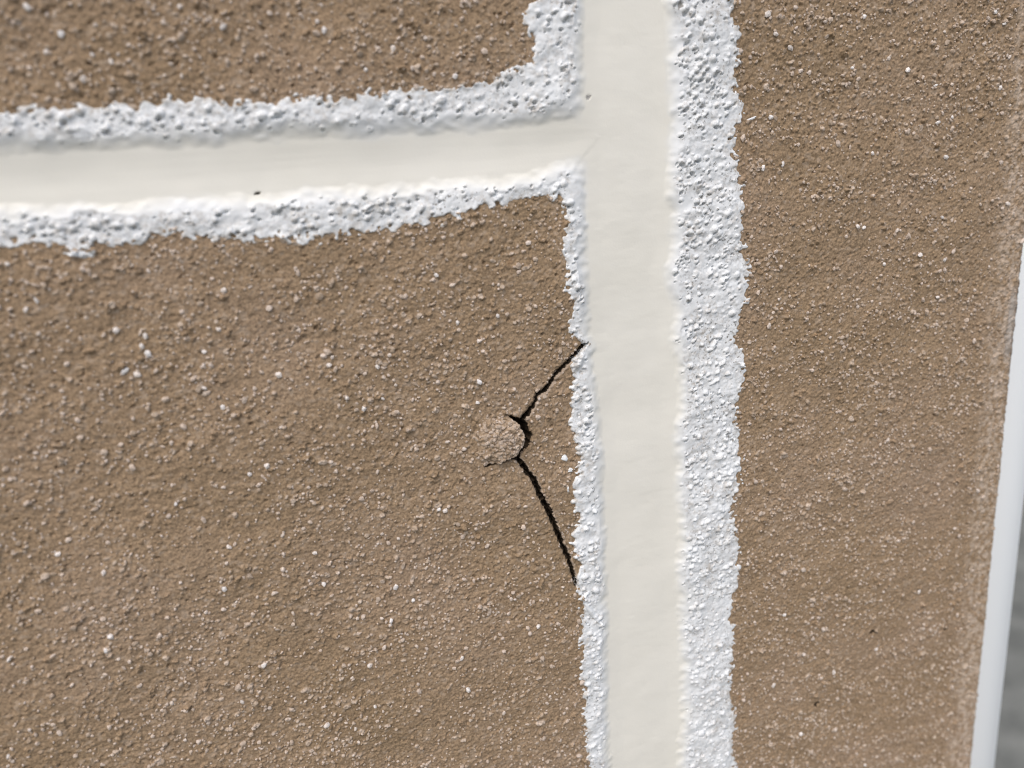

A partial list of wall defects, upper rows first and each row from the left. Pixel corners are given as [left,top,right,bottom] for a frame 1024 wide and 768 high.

crack [485,343,587,586]